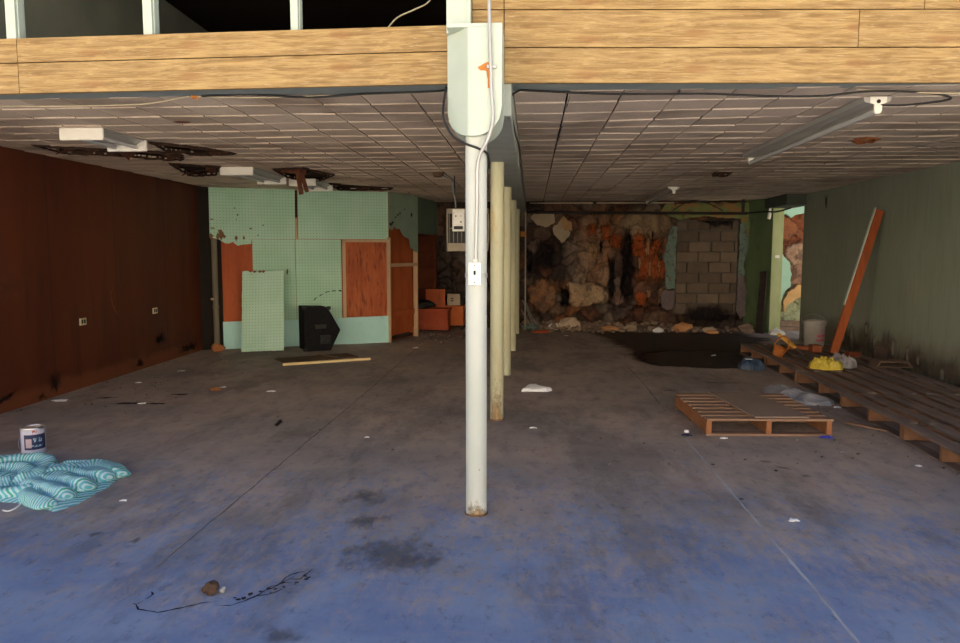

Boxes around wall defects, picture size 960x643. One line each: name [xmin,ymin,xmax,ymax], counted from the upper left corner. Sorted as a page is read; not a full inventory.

damp [841,328,960,386]